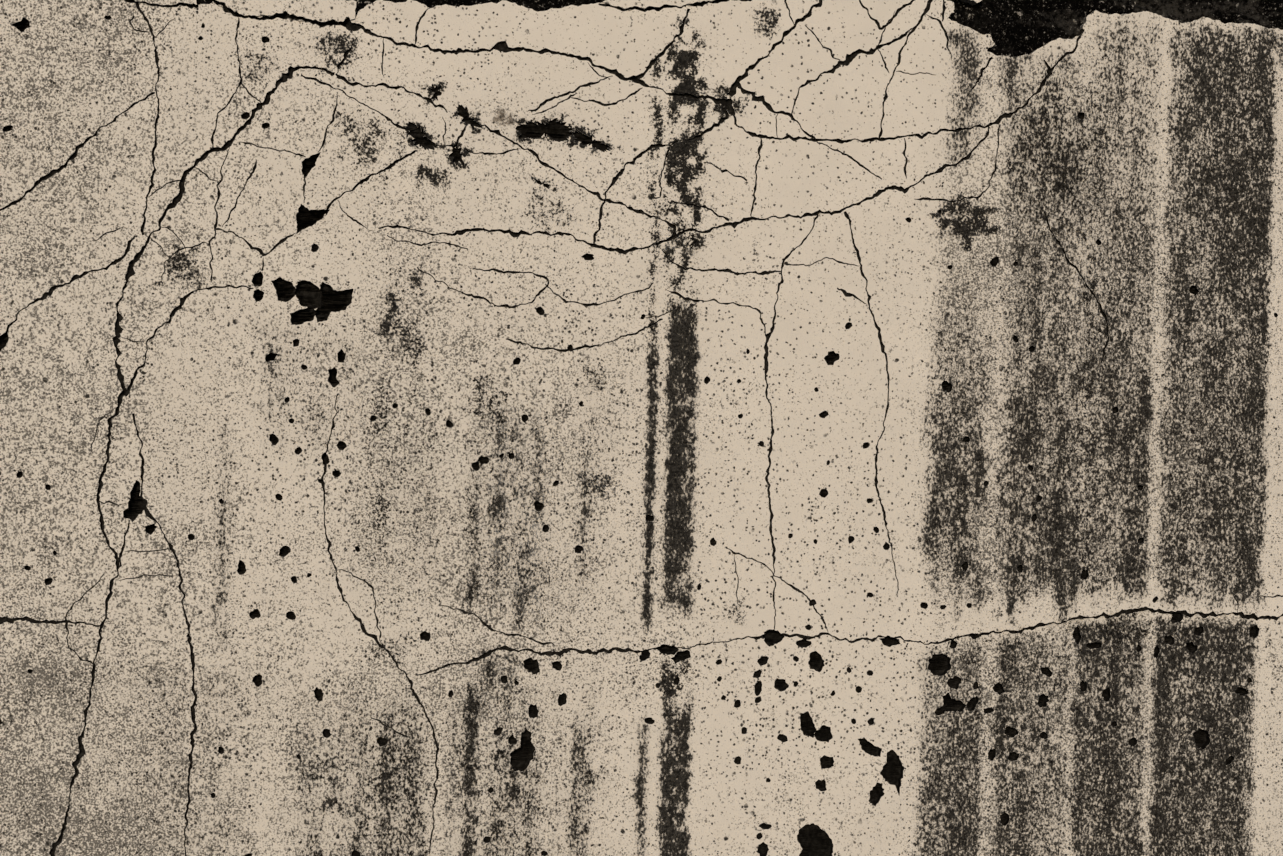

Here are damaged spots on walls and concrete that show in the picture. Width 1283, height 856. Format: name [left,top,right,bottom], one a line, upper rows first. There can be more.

crack [0,0,447,856]
crack [321,394,656,854]
water stain [632,657,695,856]
water stain [640,17,712,634]
crack [343,0,1085,629]
crack [677,635,764,649]
crack [782,605,972,645]
water stain [912,15,1283,856]
crack [978,593,1283,637]